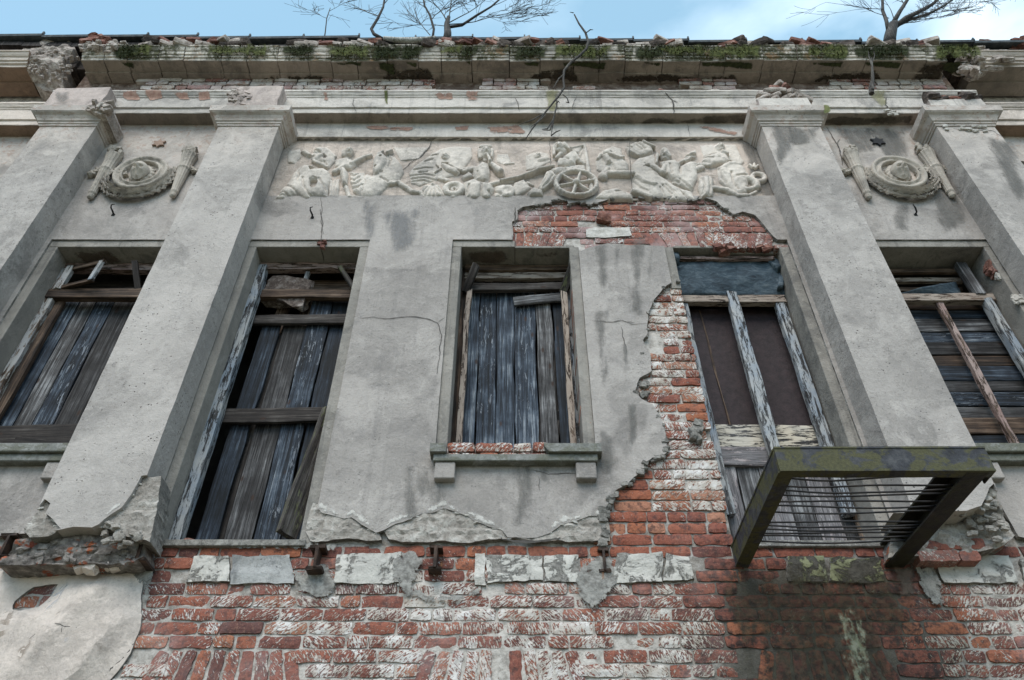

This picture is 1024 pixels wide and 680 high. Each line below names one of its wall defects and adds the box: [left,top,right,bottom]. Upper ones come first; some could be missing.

leakage [616,74,737,82]
leakage [915,64,944,80]
flaking render [512,196,788,258]
spalling [983,259,1002,281]
spalling [1010,294,1024,305]
crack [365,316,442,373]
flaking render [305,279,733,548]
spalling [0,476,171,609]
spalling [883,527,904,565]
spalling [908,488,1015,570]